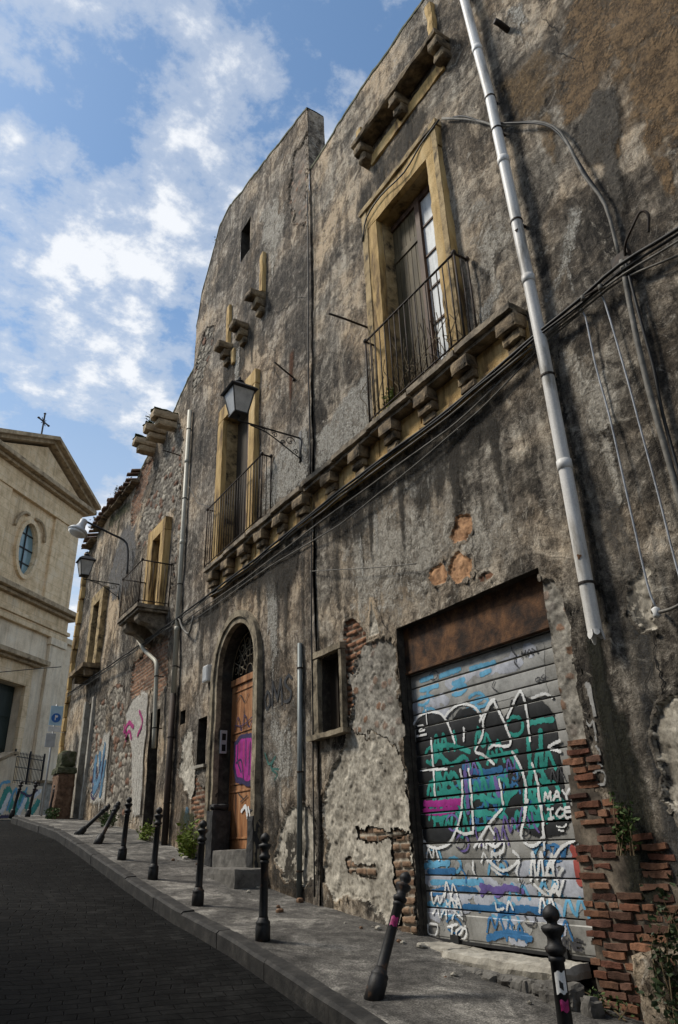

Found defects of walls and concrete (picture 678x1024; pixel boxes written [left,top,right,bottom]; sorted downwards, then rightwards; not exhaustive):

flaking render [107,633,170,825]
flaking render [266,596,426,948]
leakage [329,384,507,623]
flaking render [426,509,498,591]
flaking render [537,563,678,1022]
crack [645,635,665,695]